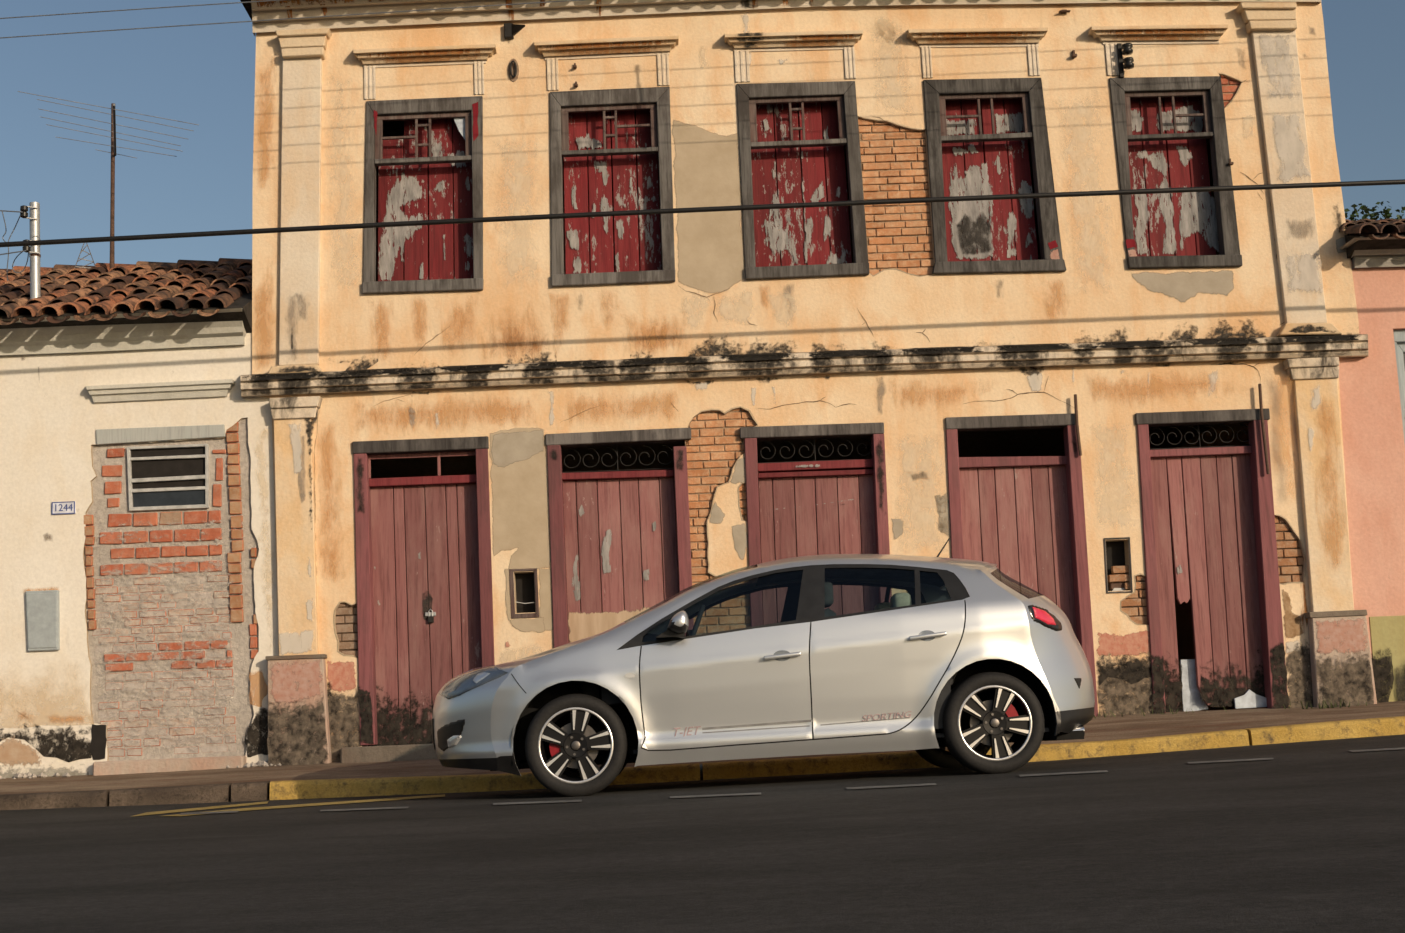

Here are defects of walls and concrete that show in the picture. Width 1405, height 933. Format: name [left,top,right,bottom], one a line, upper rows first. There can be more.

spalling [858,116,934,277]
peeling [946,119,1060,260]
leakage [243,293,1359,426]
leakage [299,411,331,516]
leakage [1280,380,1291,465]
spalling [684,406,758,635]
leakage [0,692,92,762]
peeling [270,600,358,704]
spalling [1096,566,1150,657]
leakage [1096,653,1184,716]
spalling [1275,515,1306,653]
leakage [1200,643,1405,709]